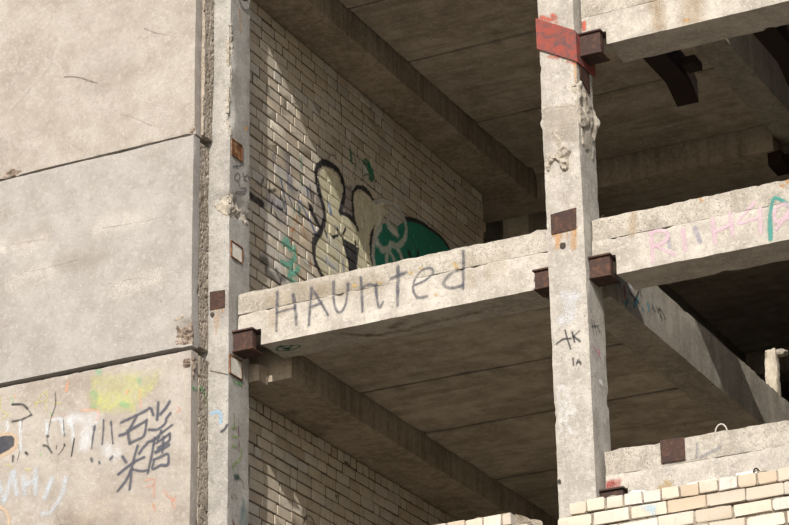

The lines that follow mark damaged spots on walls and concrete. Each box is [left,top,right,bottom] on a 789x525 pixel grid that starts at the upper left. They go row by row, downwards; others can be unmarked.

spalling [213,191,248,225]